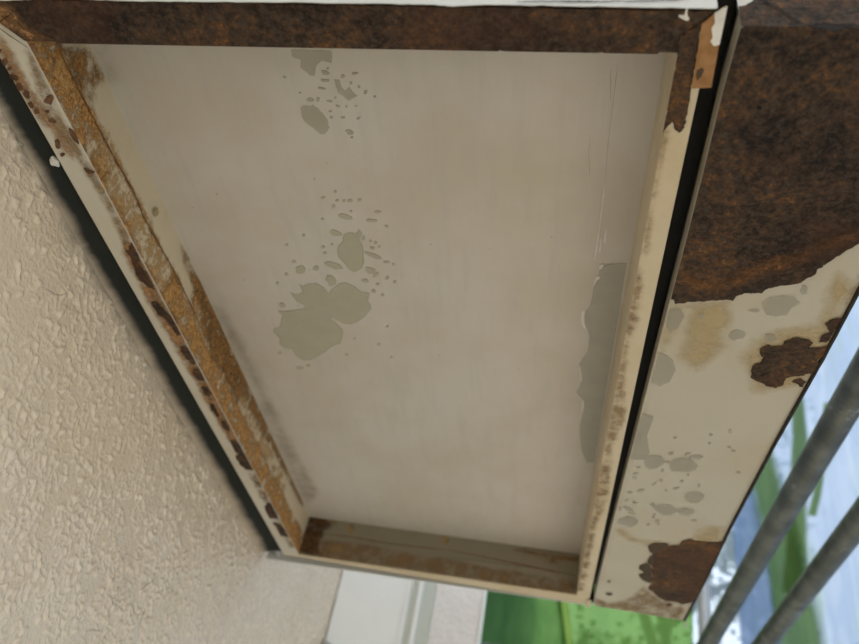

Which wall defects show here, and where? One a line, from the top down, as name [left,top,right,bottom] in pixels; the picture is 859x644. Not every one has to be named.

peeling [291,50,376,134]
rust [671,0,859,304]
peeling [273,230,396,370]
rust [0,0,712,594]
peeling [577,263,626,462]
peeling [651,354,675,386]
peeling [748,285,808,317]
rust [751,318,842,388]
peeling [617,414,704,527]
rust [597,539,722,618]